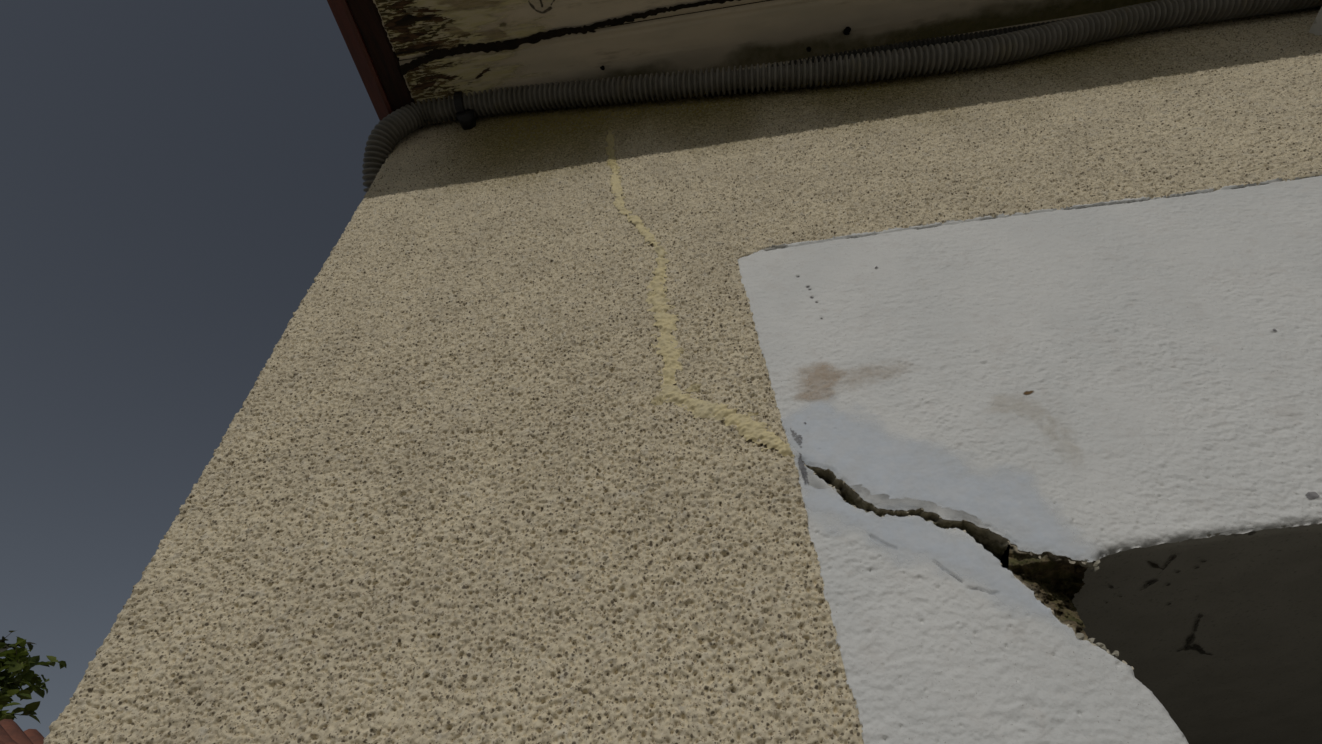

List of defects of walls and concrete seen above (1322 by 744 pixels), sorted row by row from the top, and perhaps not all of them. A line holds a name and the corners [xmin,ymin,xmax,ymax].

water stain [731,0,1157,70]
crack [605,131,1011,565]